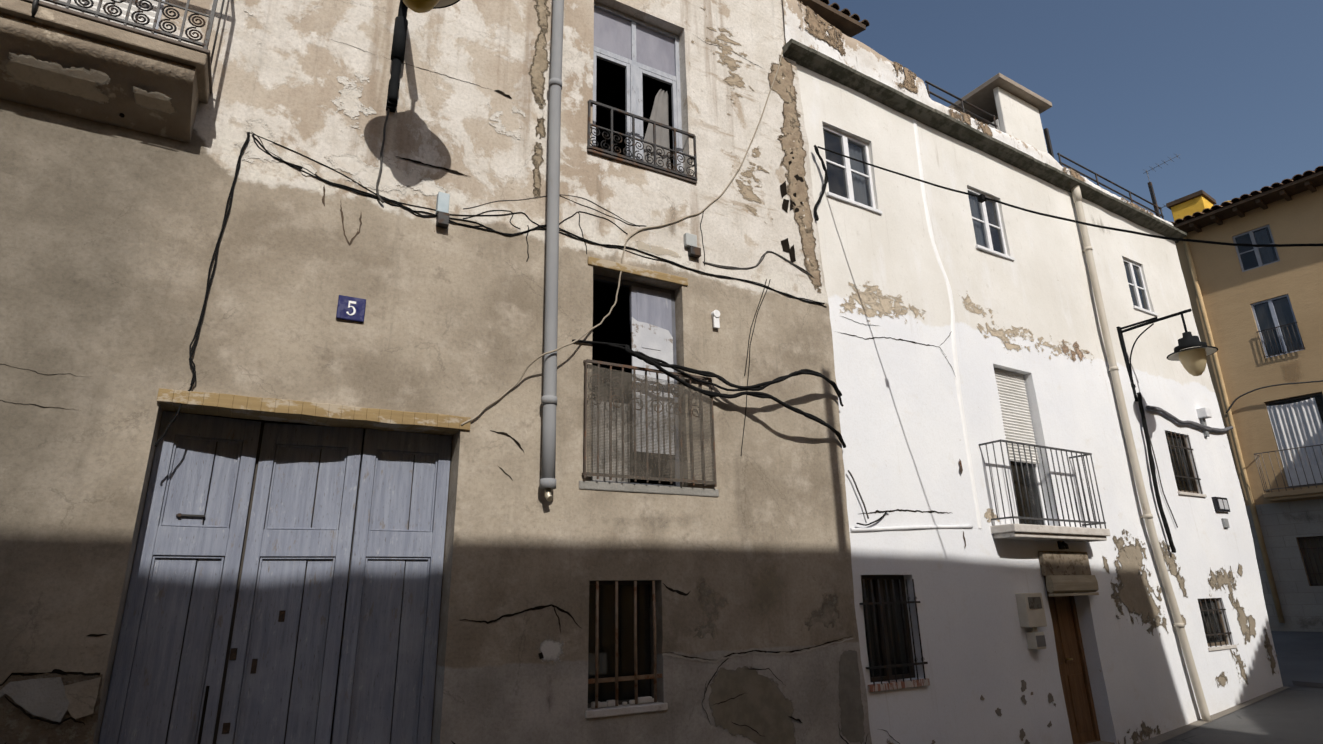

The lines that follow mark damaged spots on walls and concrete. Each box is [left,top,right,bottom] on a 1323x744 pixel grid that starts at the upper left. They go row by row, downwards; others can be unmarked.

peeling [2,52,125,118]
peeling [133,86,175,115]
spalling [488,0,551,199]
peeling [691,7,754,115]
spalling [732,55,822,294]
peeling [835,281,925,324]
peeling [959,291,1094,363]
crack [2,364,91,409]
spalling [0,587,103,744]
crack [463,604,581,632]
peeling [1103,529,1188,636]
peeling [1208,564,1279,688]